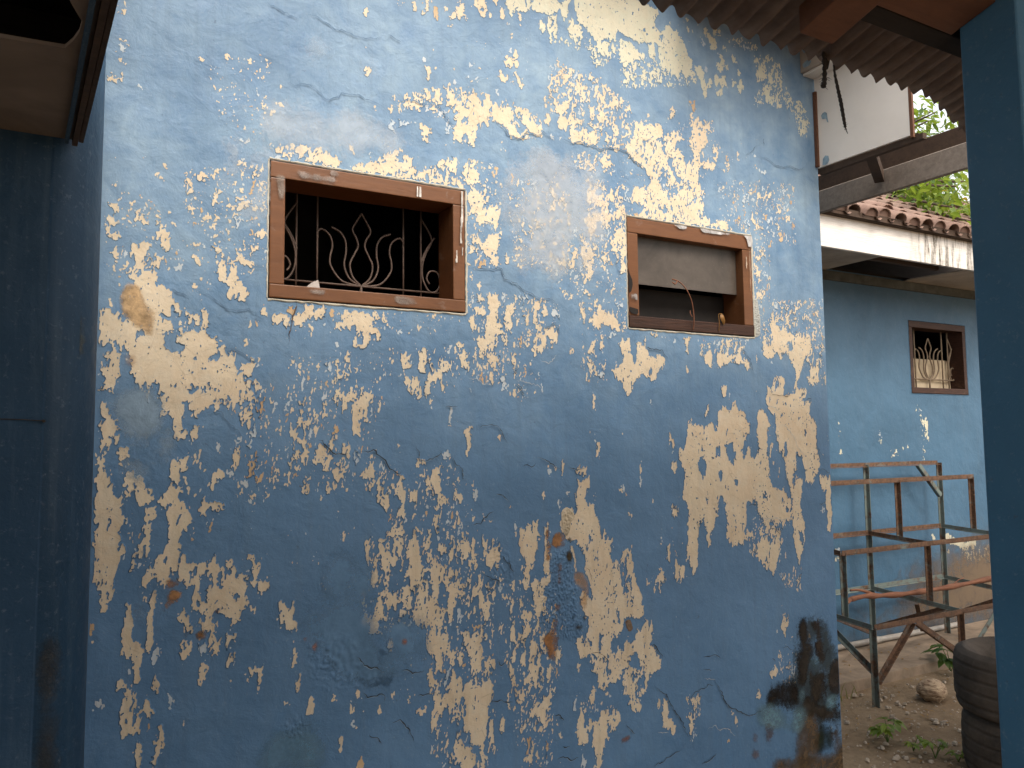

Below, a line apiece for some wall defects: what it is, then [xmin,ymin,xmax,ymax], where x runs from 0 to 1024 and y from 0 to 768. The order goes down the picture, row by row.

crack [289,76,454,126]
water stain [122,285,152,333]
peeling [89,0,833,768]
corrosion [546,531,562,560]
corrosion [543,605,559,660]
crack [626,654,765,766]
water stain [762,619,843,768]